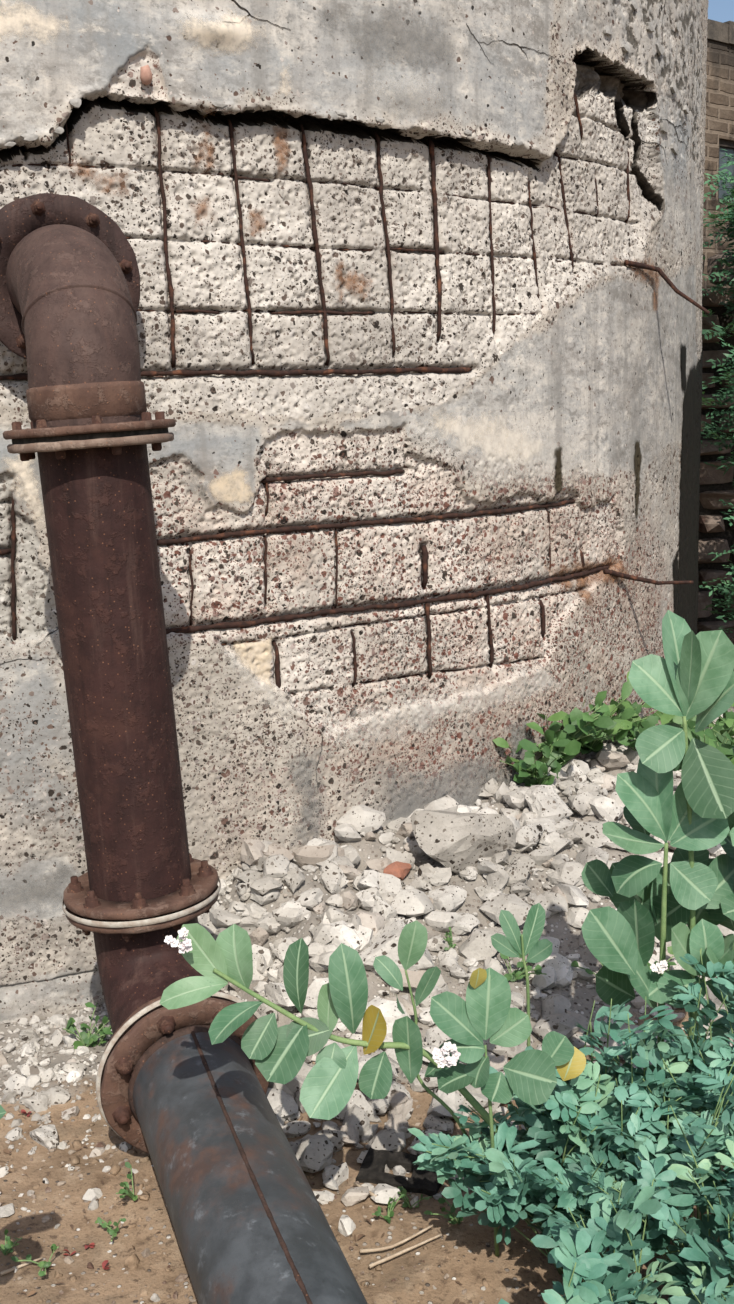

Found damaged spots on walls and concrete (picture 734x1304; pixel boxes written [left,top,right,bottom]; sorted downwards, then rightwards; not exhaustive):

crack [233,0,290,30]
corrosion [630,263,659,310]
spalling [0,0,710,740]
corrosion [553,559,627,605]